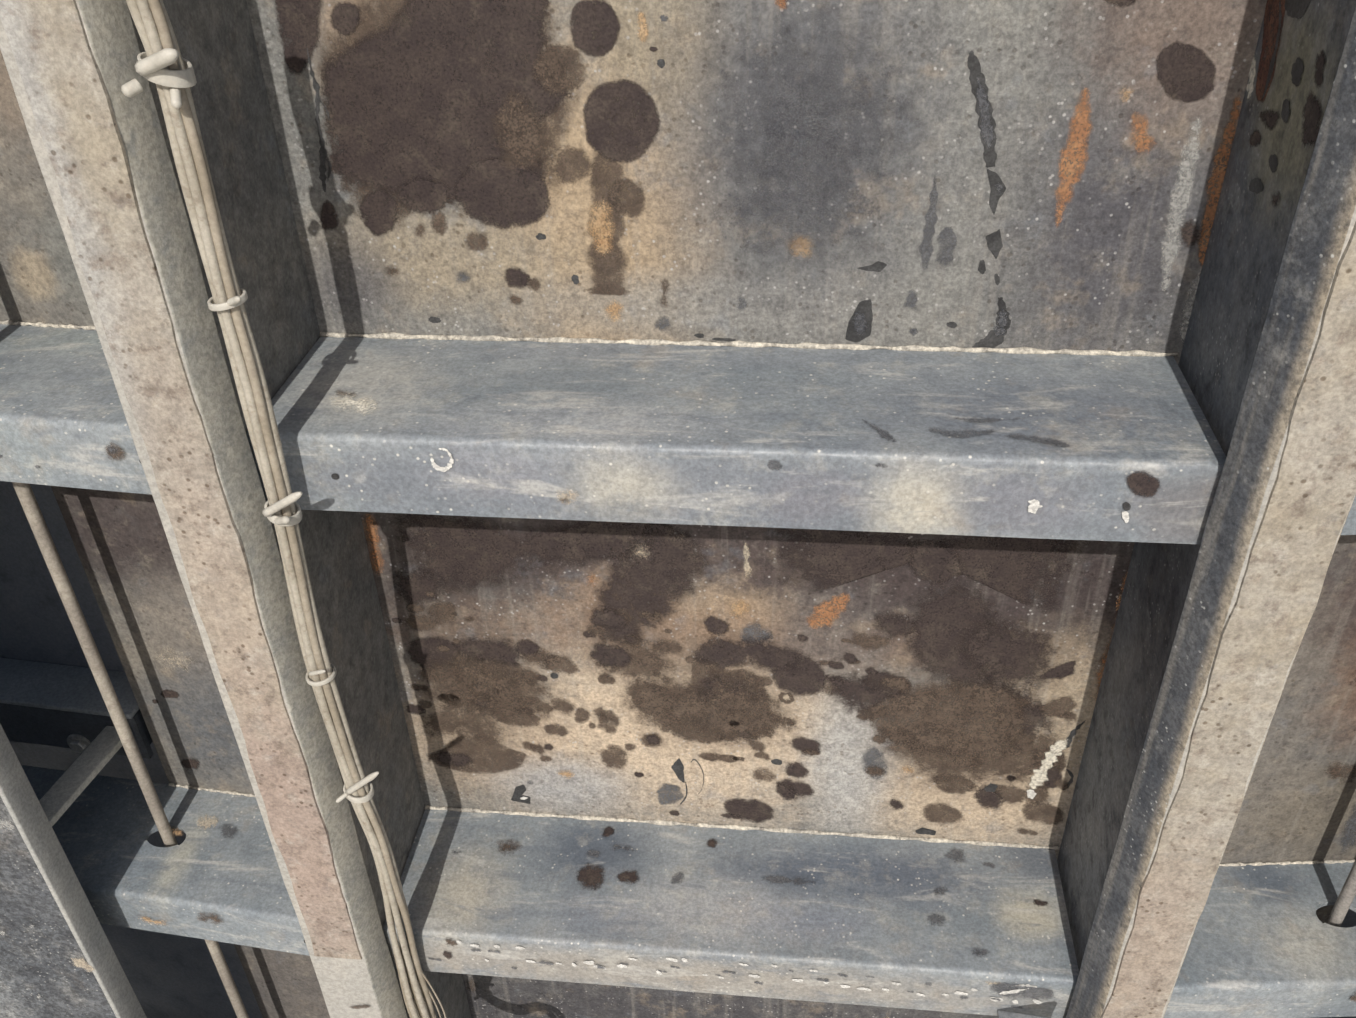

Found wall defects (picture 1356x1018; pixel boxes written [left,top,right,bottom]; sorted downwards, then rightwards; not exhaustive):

water stain [275,0,660,250]
corrosion [1057,90,1091,223]
corrosion [1199,99,1241,265]
water stain [1249,51,1325,205]
water stain [505,268,540,304]
water stain [391,513,1086,835]
corrosion [808,595,849,627]